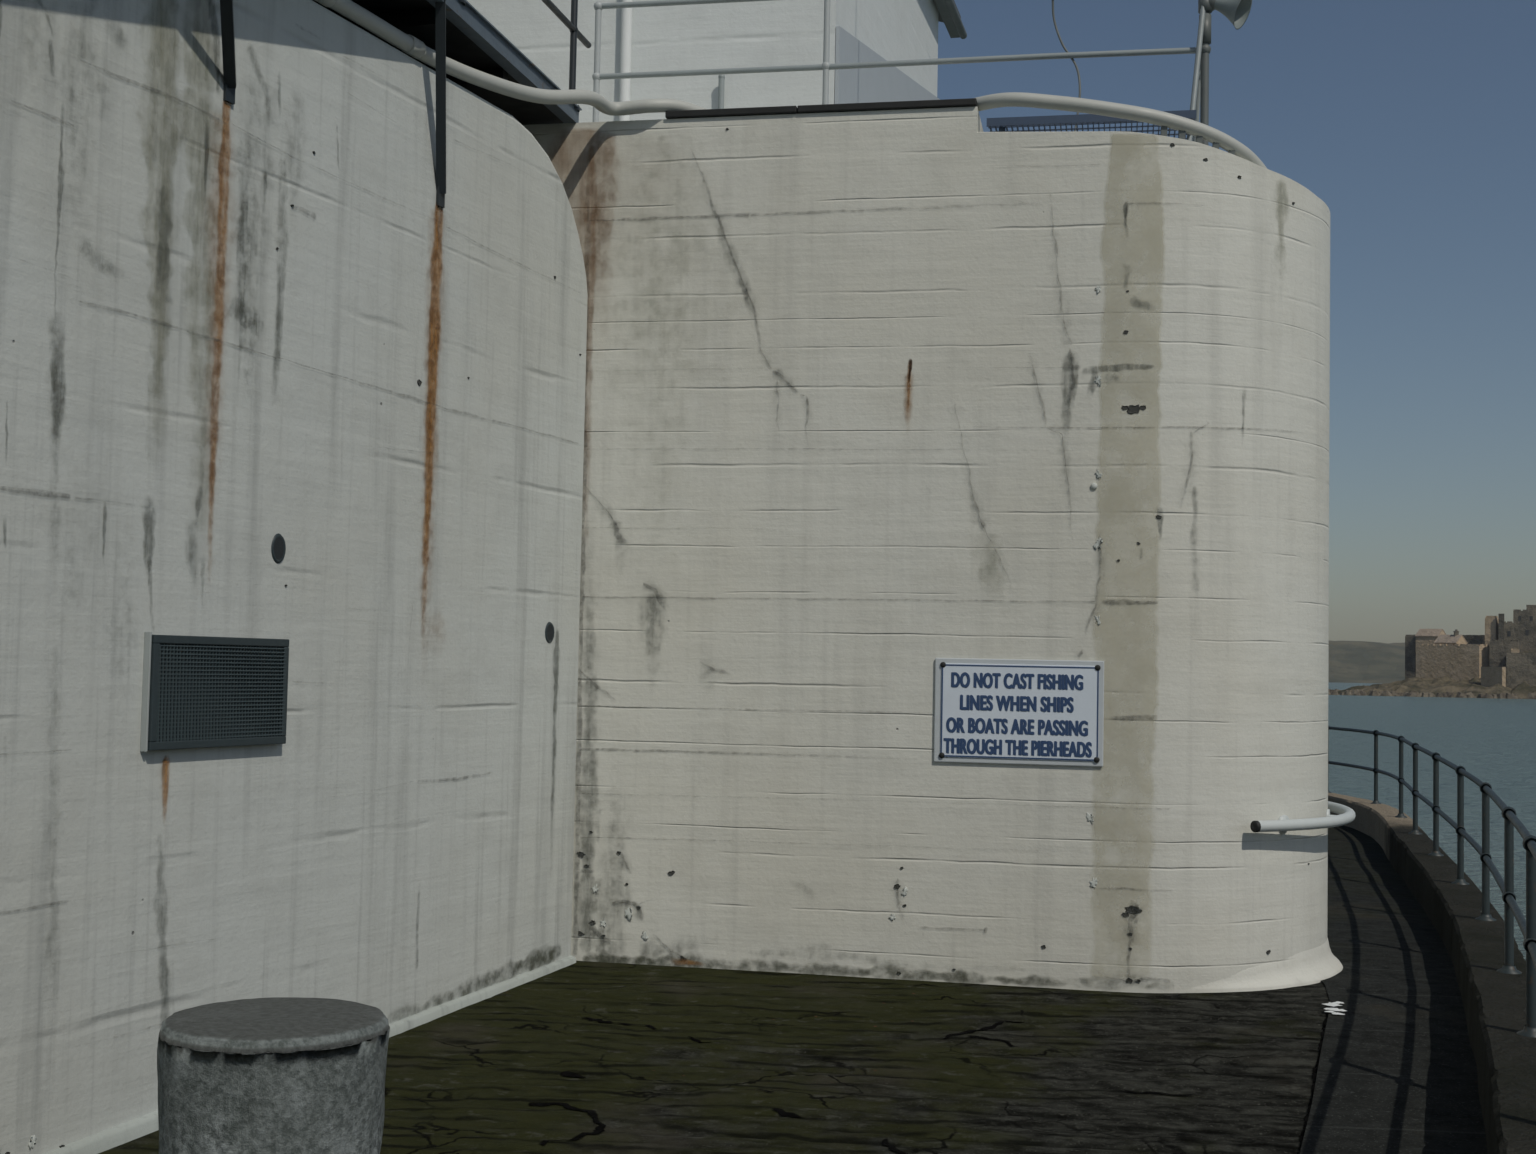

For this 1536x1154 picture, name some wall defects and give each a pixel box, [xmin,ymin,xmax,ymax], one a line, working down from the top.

rust [216,103,229,374]
rust [424,205,443,561]